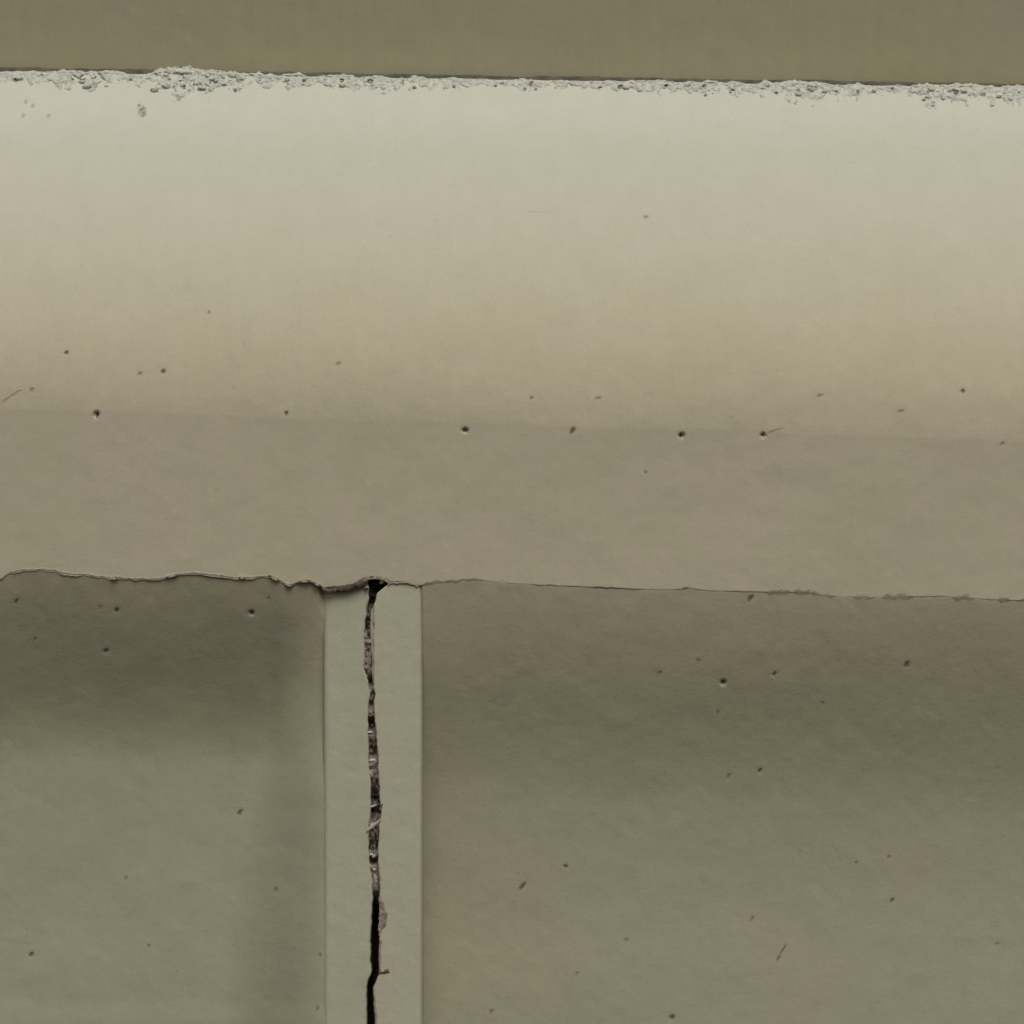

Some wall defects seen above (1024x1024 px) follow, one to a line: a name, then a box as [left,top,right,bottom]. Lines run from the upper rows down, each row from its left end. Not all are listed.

spalling [0,65,1024,110]
spalling [322,575,484,596]
peeling [745,588,835,604]
crack [364,580,390,1024]